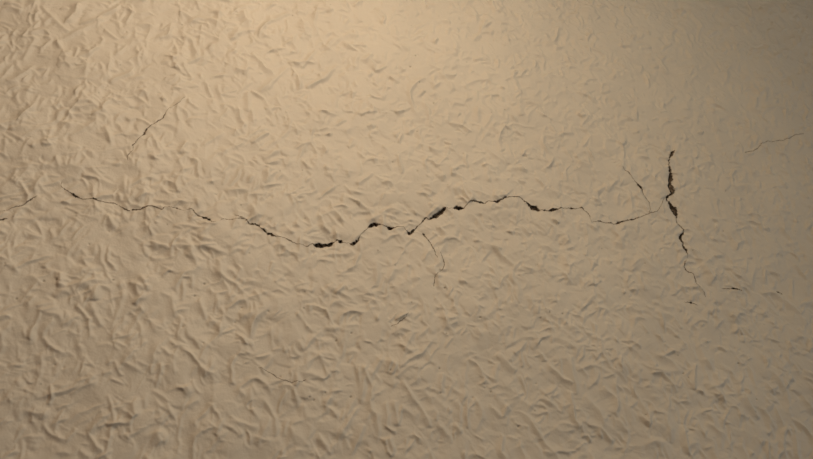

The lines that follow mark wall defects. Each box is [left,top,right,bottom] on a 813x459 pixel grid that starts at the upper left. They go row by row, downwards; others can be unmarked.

crack [61,150,742,306]